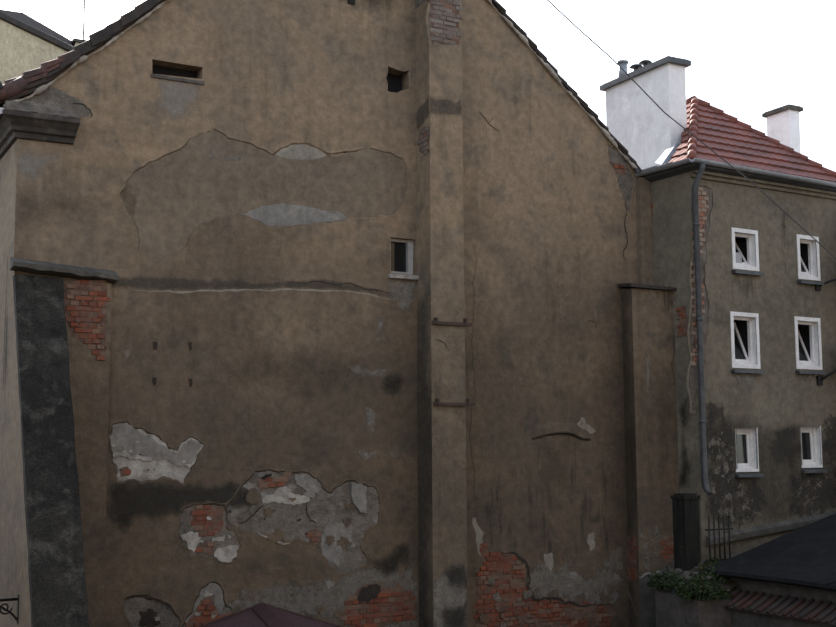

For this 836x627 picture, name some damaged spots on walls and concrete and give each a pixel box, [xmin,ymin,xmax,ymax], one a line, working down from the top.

flaking render [426,0,463,48]
flaking render [117,127,410,263]
flaking render [64,279,110,361]
flaking render [108,418,207,487]
damp [706,403,766,528]
damp [790,417,836,516]
flaking render [121,467,418,627]
flaking render [434,517,625,627]